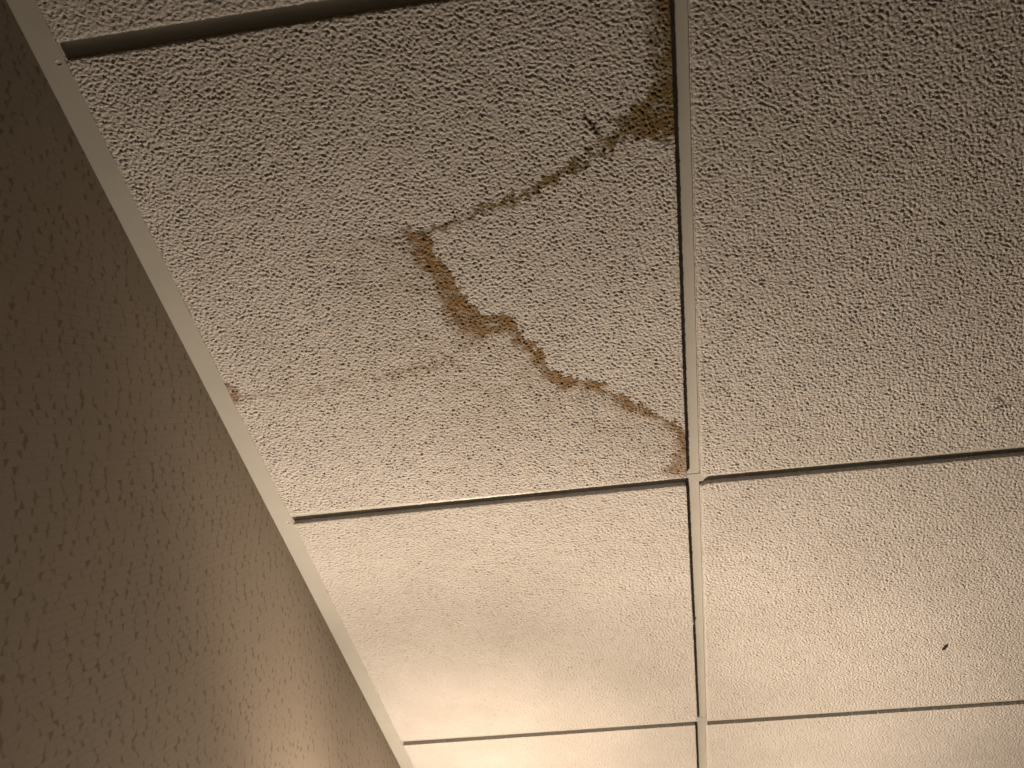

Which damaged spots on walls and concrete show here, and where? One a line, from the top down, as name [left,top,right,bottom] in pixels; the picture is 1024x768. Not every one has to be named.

water stain [405,0,687,475]